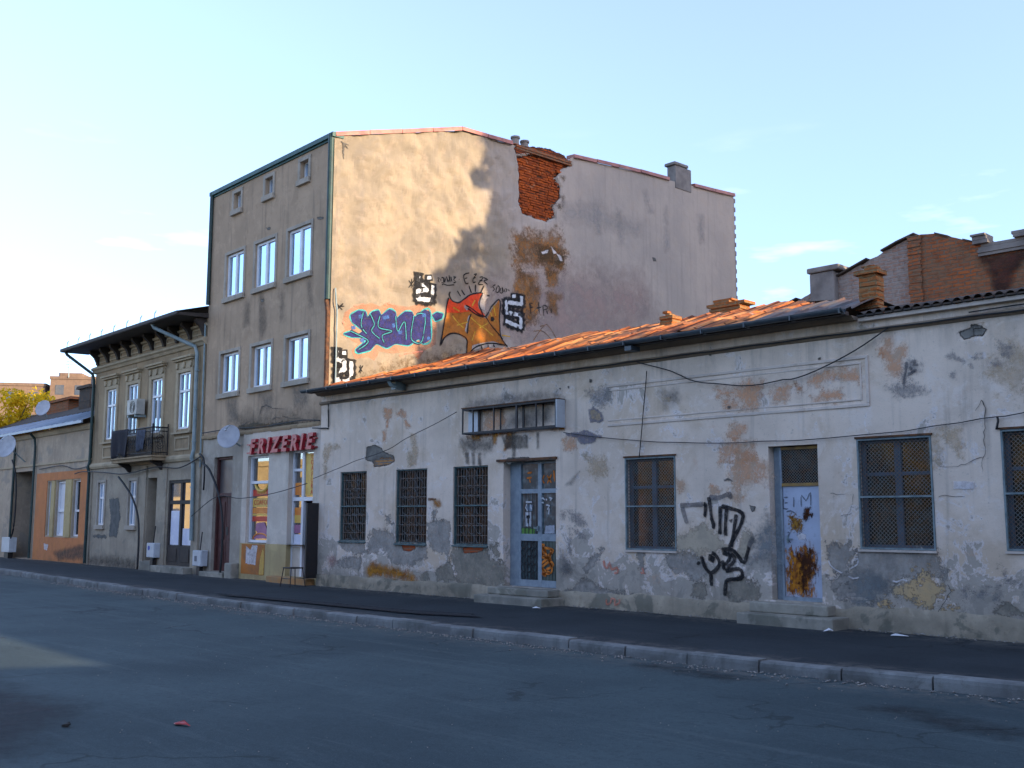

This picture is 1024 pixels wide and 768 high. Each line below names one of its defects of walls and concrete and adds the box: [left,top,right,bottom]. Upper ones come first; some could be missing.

flaking render [514,146,568,222]
flaking render [337,498,505,586]
flaking render [564,547,633,596]
flaking render [665,522,755,599]
corrosion [787,507,813,533]
corrosion [785,543,821,598]
flaking render [825,540,966,613]